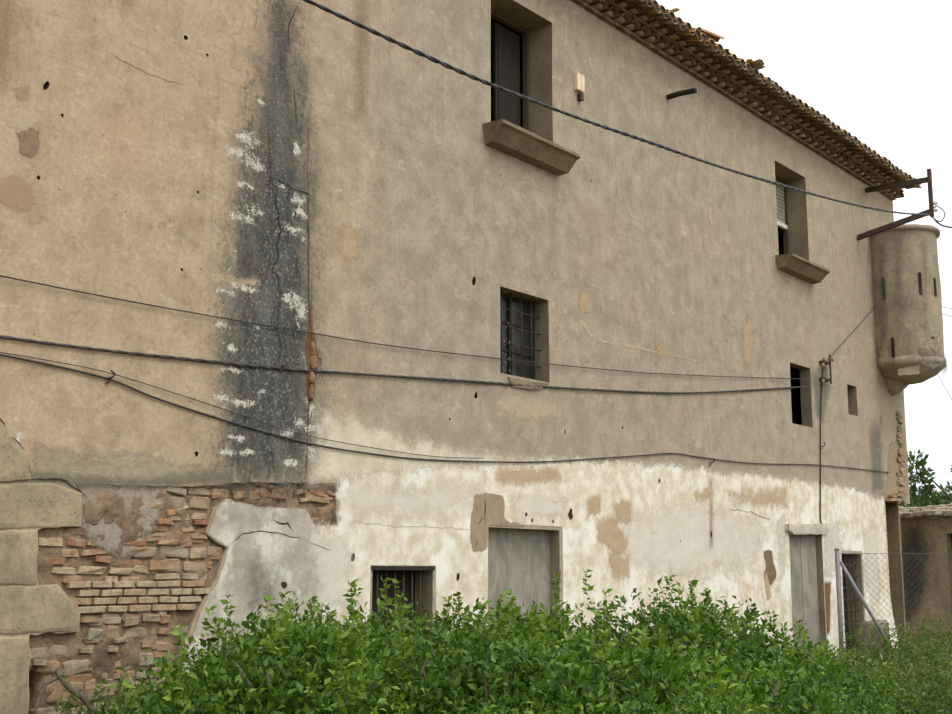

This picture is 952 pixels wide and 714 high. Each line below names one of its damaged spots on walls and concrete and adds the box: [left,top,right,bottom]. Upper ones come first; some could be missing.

damp [31,474,69,484]
damp [160,0,332,498]
crack [213,521,329,550]
crack [268,86,313,362]
corrosion [306,307,319,404]
peeling [28,411,908,714]